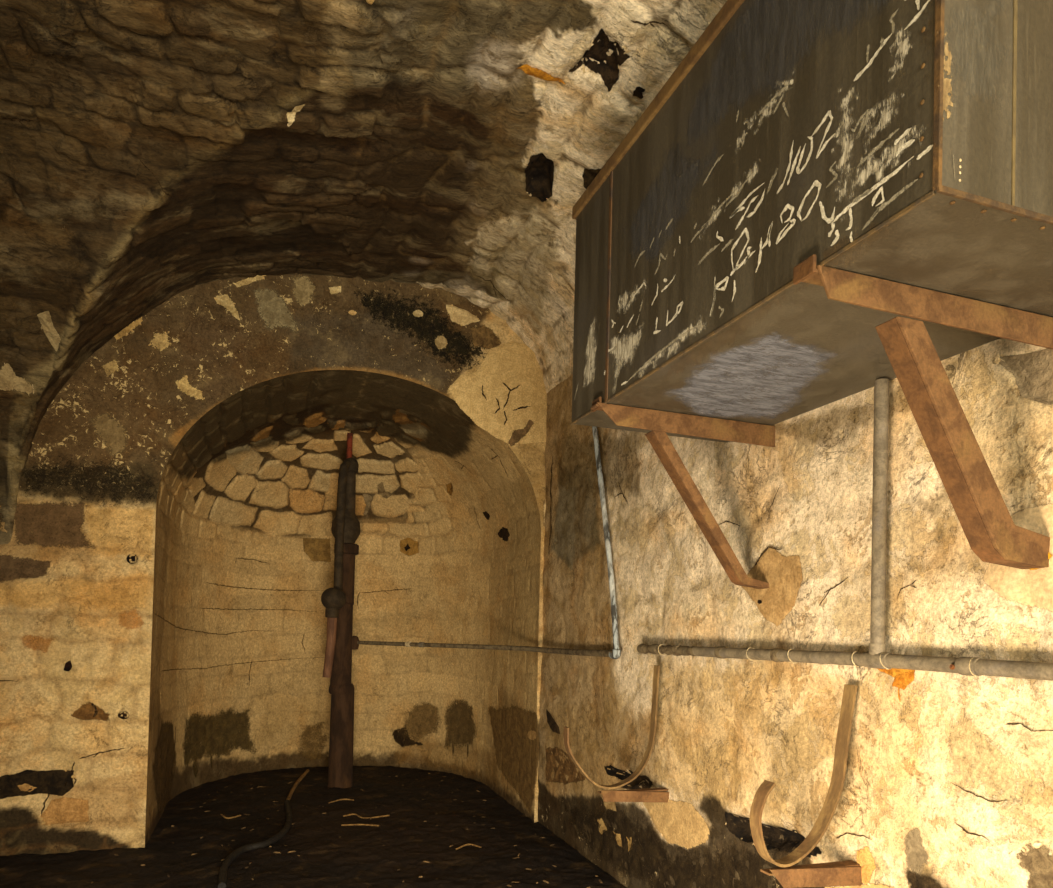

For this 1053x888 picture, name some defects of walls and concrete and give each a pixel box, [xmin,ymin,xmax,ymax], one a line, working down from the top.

spalling [569,29,631,92]
spalling [524,153,554,202]
damp [348,287,486,369]
crack [482,383,531,425]
damp [0,456,159,583]
damp [392,699,476,757]
damp [153,709,256,815]
damp [488,705,540,817]
spalling [1016,842,1053,888]